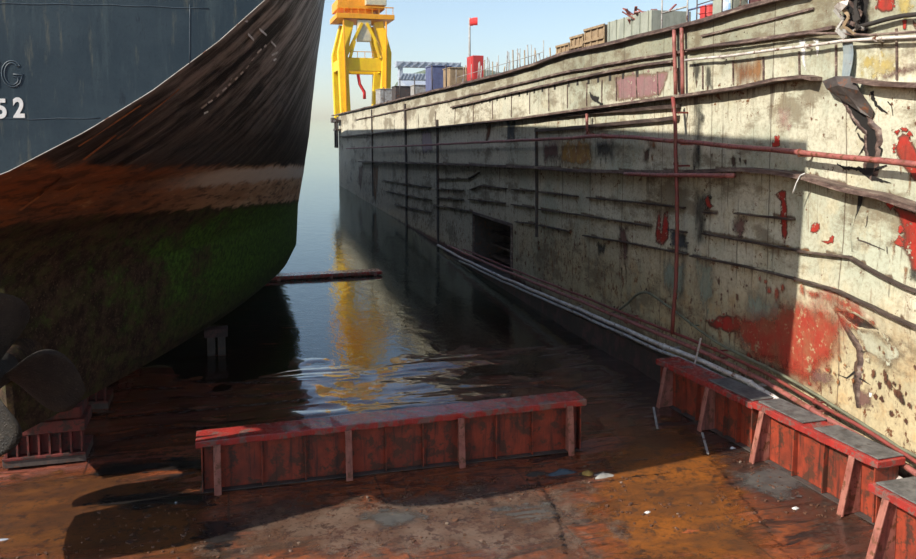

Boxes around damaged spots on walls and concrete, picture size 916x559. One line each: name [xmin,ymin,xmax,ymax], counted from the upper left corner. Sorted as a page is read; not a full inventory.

peeling [875,0,913,13]
crack [837,91,893,252]
peeling [892,127,916,185]
peeling [655,211,669,247]
peeling [695,189,713,251]
peeling [810,222,834,244]
peeling [886,203,916,280]
peeling [700,288,899,386]
crack [837,313,870,408]
corrosion [0,470,210,559]
corrosion [572,418,765,559]